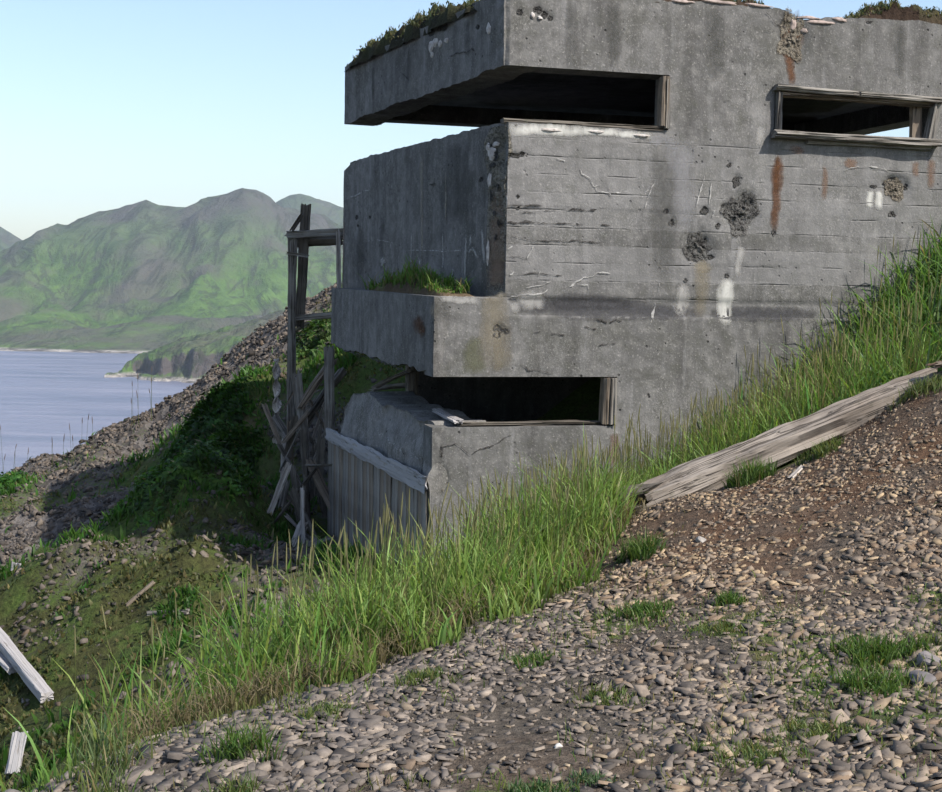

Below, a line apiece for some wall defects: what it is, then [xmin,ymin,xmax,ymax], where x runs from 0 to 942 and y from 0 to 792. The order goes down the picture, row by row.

peeling [671,0,772,8]
spalling [777,8,847,63]
corrosion [785,53,795,81]
spalling [478,124,651,296]
spalling [700,162,760,238]
corrosion [772,159,782,226]
water stain [867,192,882,208]
spalling [870,177,908,217]
spalling [682,231,715,262]
water stain [512,279,688,319]
water stain [715,249,810,322]